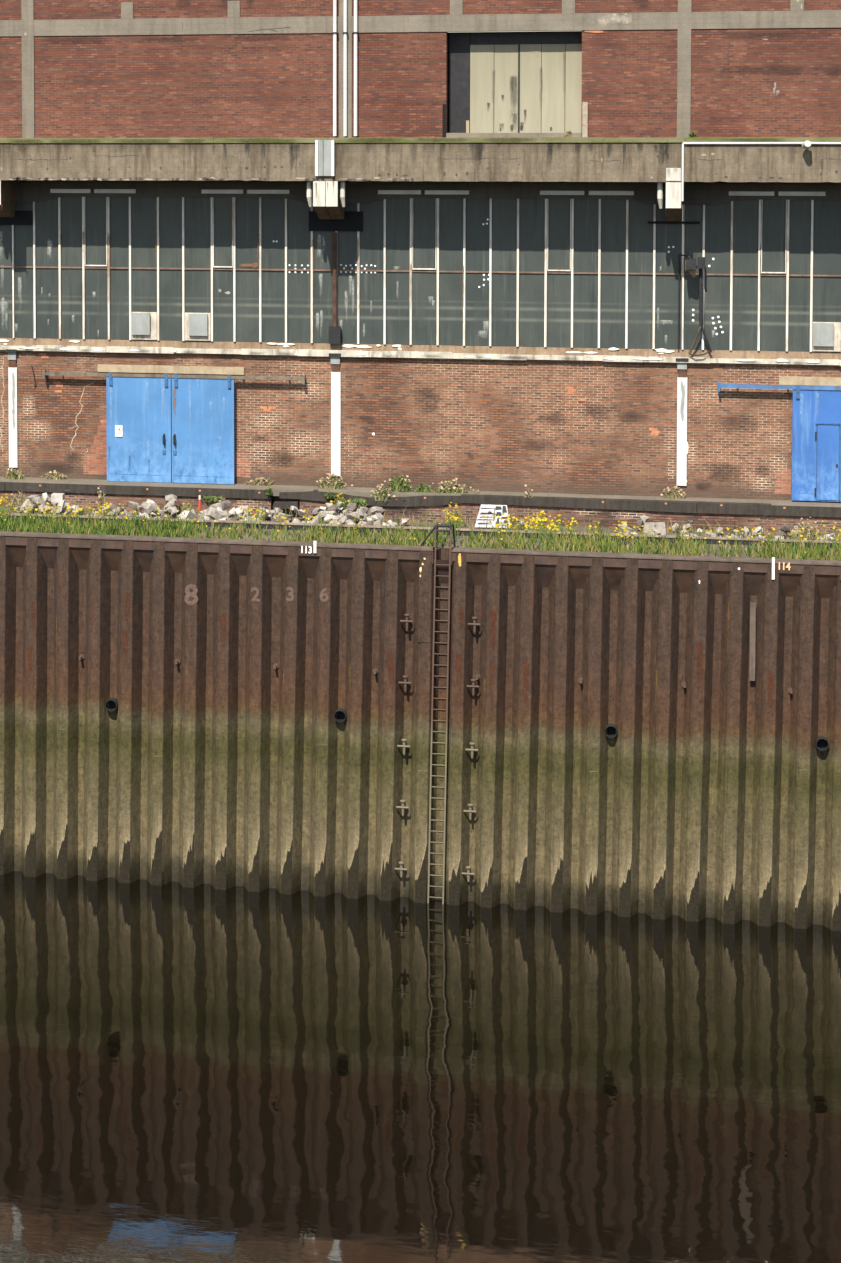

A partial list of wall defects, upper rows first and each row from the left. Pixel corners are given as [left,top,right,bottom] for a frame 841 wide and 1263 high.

crack [70,381,95,455]
leakage [151,821,162,886]
leakage [281,833,293,894]
leakage [347,833,359,899]
leakage [415,838,427,904]
leakage [515,842,527,910]
leakage [551,847,563,913]
leakage [586,857,598,915]
leakage [686,858,700,922]
leakage [723,866,736,924]
leakage [759,864,772,927]
leakage [794,866,808,929]